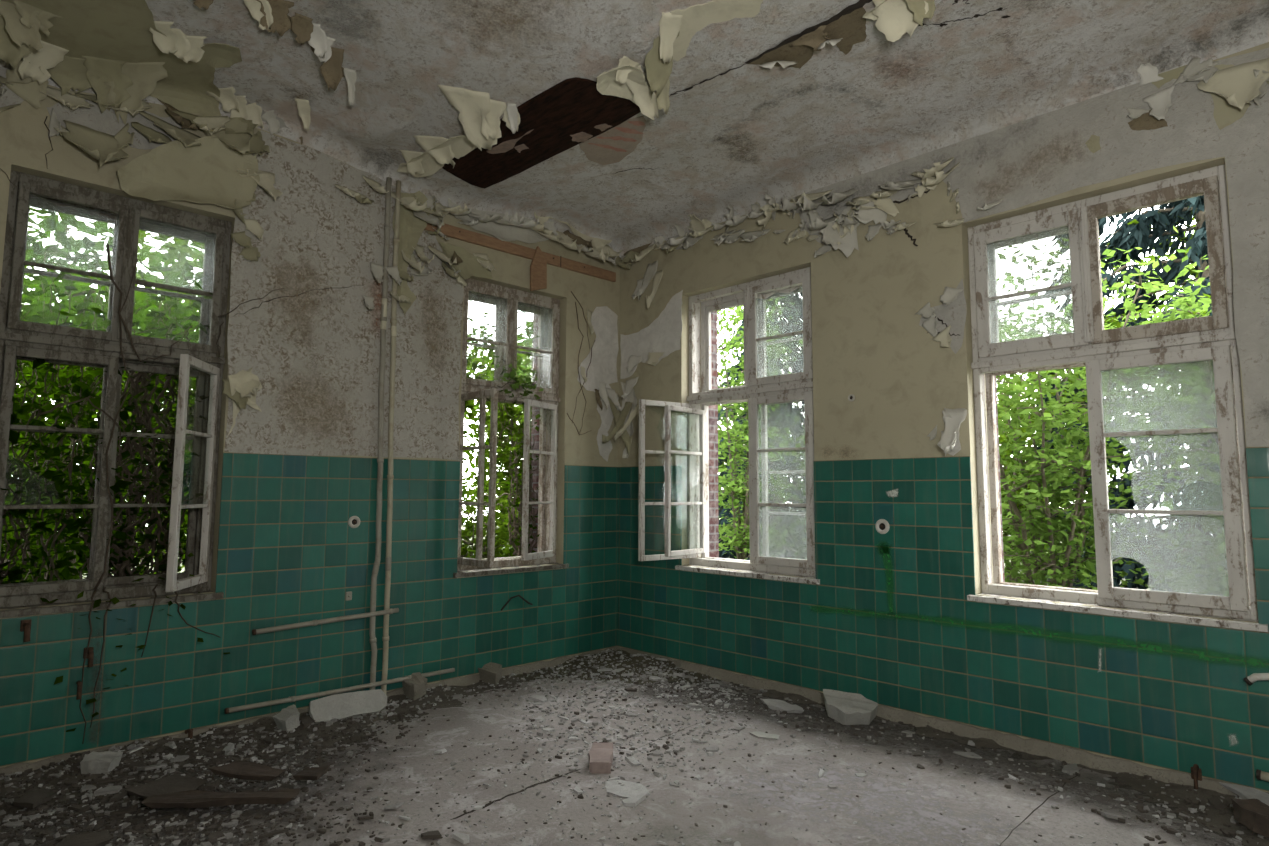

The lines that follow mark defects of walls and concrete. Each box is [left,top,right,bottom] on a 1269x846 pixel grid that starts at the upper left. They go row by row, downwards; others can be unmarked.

crack [670,63,749,96]
peeling [0,0,1269,461]
crack [999,767,1085,846]